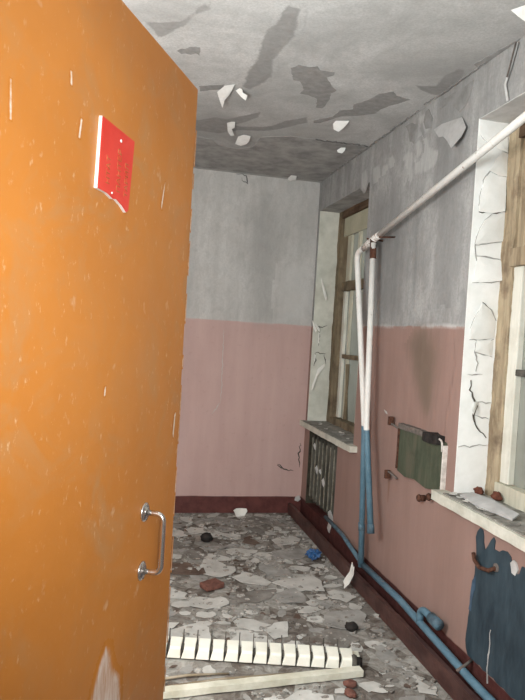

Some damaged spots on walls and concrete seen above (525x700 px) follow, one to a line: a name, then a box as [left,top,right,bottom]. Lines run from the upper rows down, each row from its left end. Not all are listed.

flaking render [140,0,219,41]
flaking render [193,1,520,193]
peeling [475,119,508,244]
crack [458,302,496,448]
peeling [470,303,496,356]
peeling [473,257,502,282]
crack [277,443,301,471]
peeling [465,528,525,700]